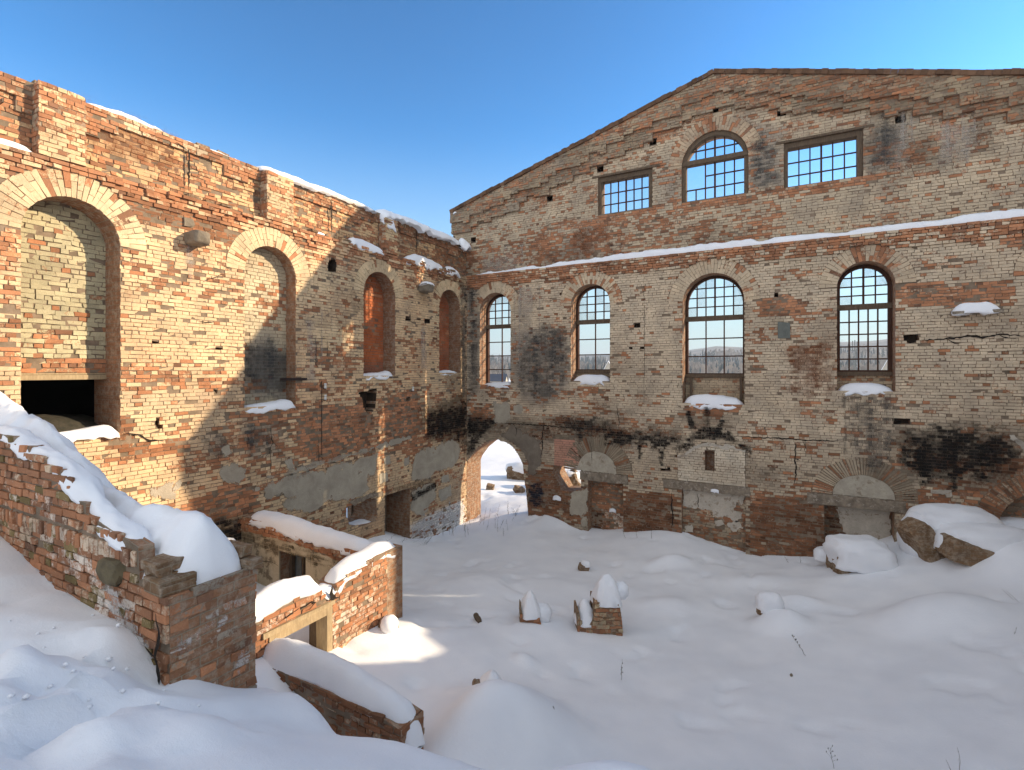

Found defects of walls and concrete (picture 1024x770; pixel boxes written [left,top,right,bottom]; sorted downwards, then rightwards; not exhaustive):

crack [926,334,1020,344]
peeling [150,389,422,522]
peeling [404,439,461,516]
leakage [685,407,725,435]